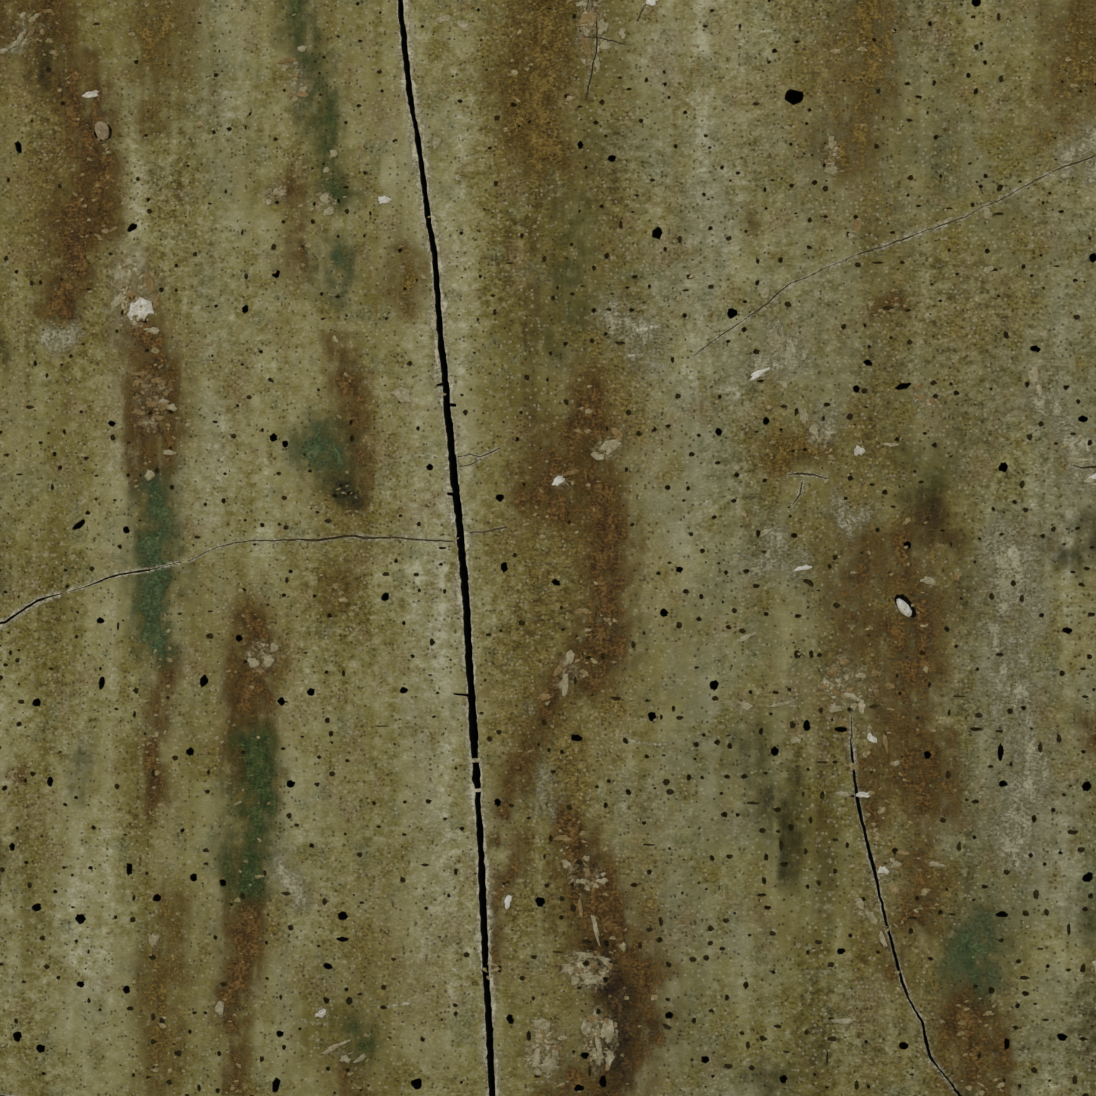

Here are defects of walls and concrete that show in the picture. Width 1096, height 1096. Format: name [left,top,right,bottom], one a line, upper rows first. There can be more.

corrosion [0,0,121,324]
corrosion [487,0,587,175]
corrosion [108,314,182,492]
corrosion [222,605,279,786]
crack [0,0,507,1096]
corrosion [491,368,634,848]
corrosion [214,888,266,1092]
corrosion [481,835,530,983]
corrosion [539,797,677,1096]
crack [848,700,962,1096]